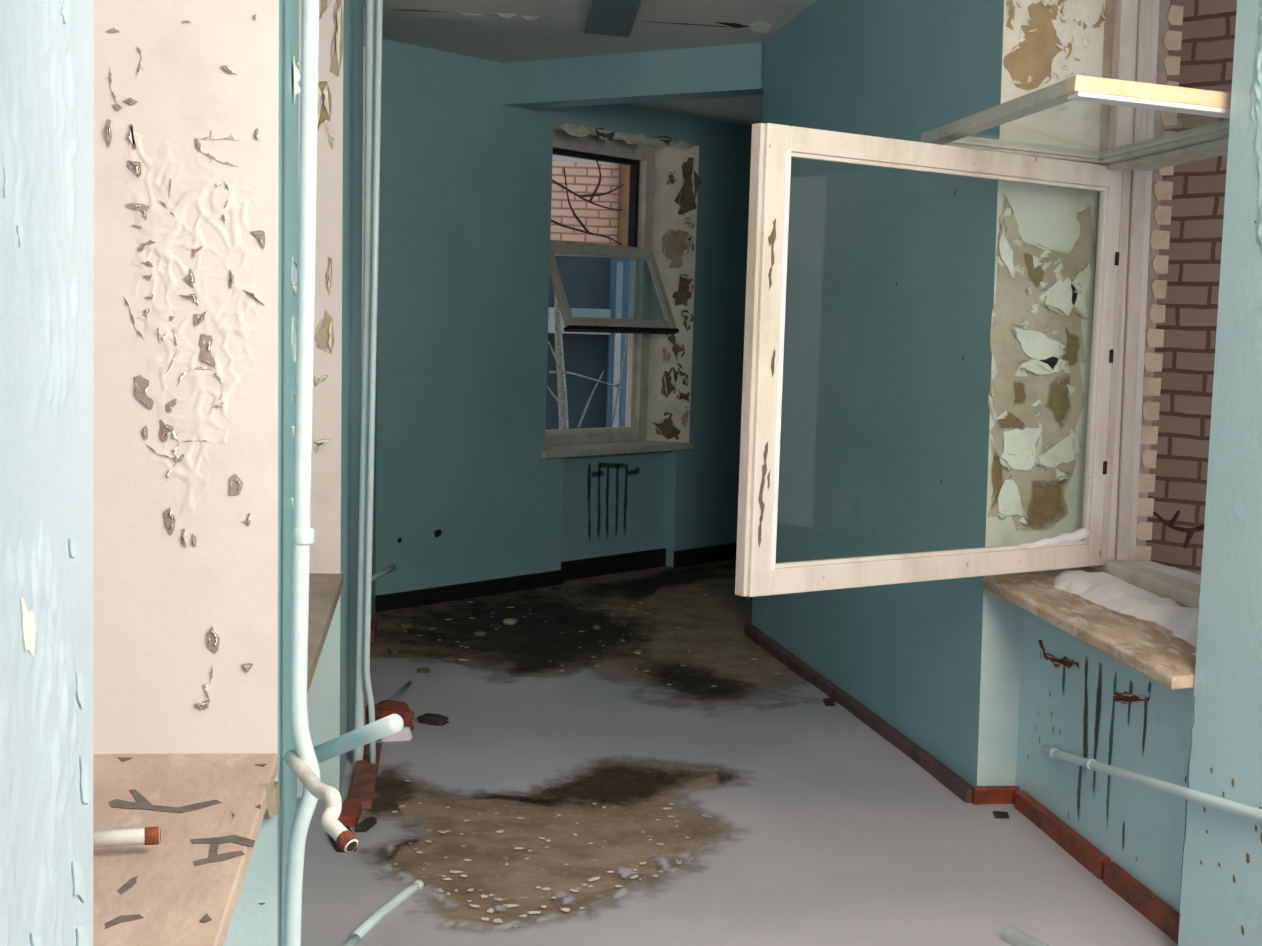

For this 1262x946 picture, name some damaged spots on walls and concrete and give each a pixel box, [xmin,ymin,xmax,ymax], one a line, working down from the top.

peeling [318,0,343,149]
peeling [1003,0,1108,90]
peeling [559,124,702,440]
peeling [135,375,177,442]
peeling [987,192,1096,532]
corrosion [588,463,639,537]
peeling [758,442,770,548]
leakage [383,566,722,676]
leakage [648,663,754,700]
leakage [468,765,700,806]
leakage [715,771,739,784]
corrosion [1068,658,1151,821]